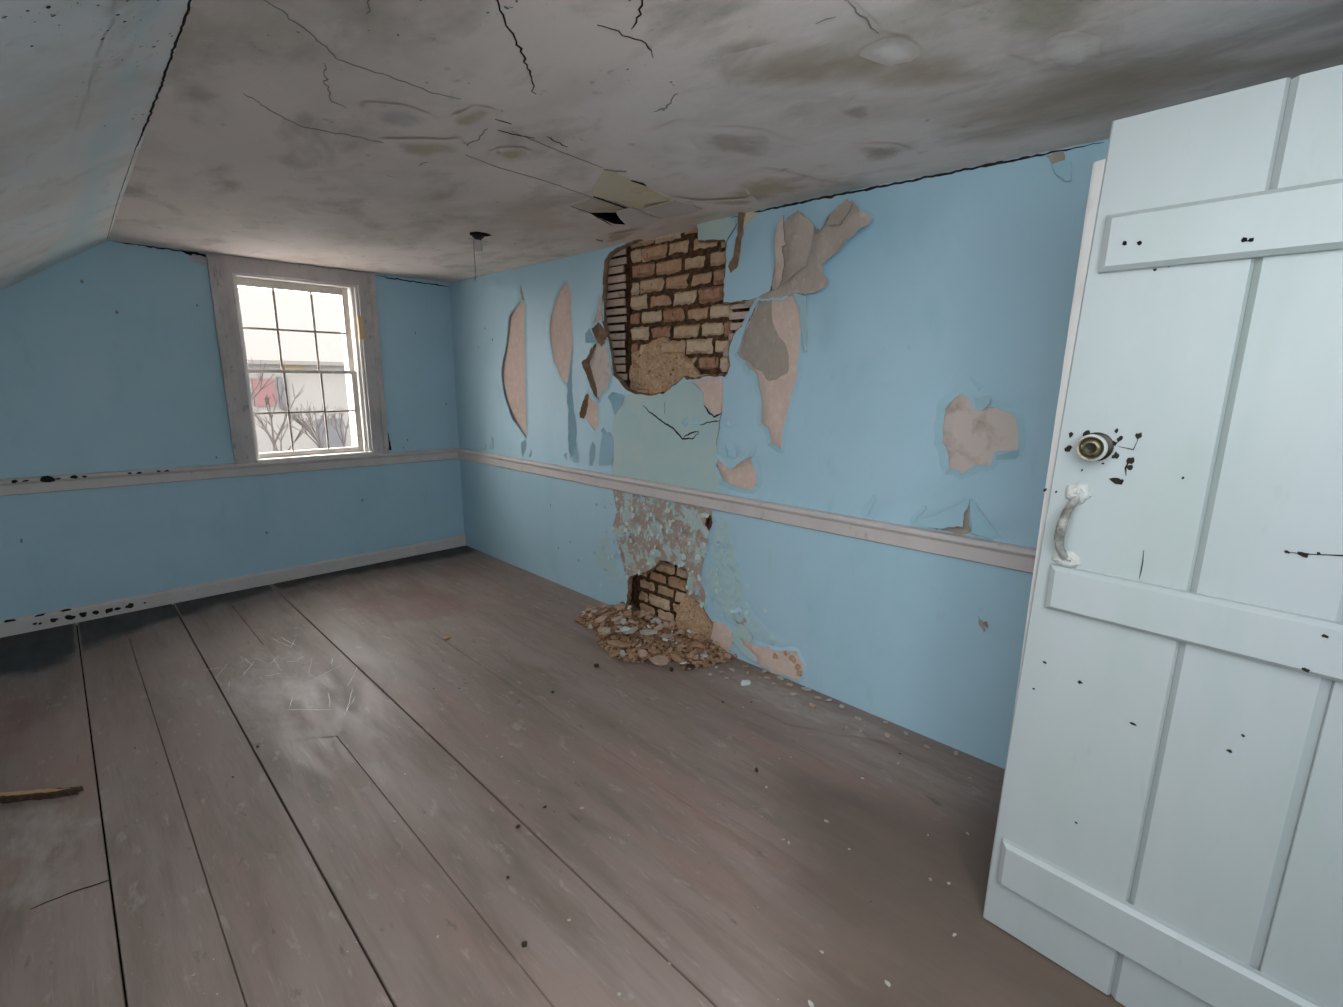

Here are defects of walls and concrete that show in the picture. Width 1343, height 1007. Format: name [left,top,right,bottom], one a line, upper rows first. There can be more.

crack [243,0,459,143]
crack [496,0,536,94]
crack [598,0,653,57]
crack [107,0,206,255]
crack [466,119,602,198]
crack [731,142,1104,218]
flaking render [503,301,532,457]
flaking render [550,281,572,385]
peeling [11,475,87,483]
flaking render [564,212,807,682]
flaking render [942,394,1019,474]
peeling [33,602,146,625]